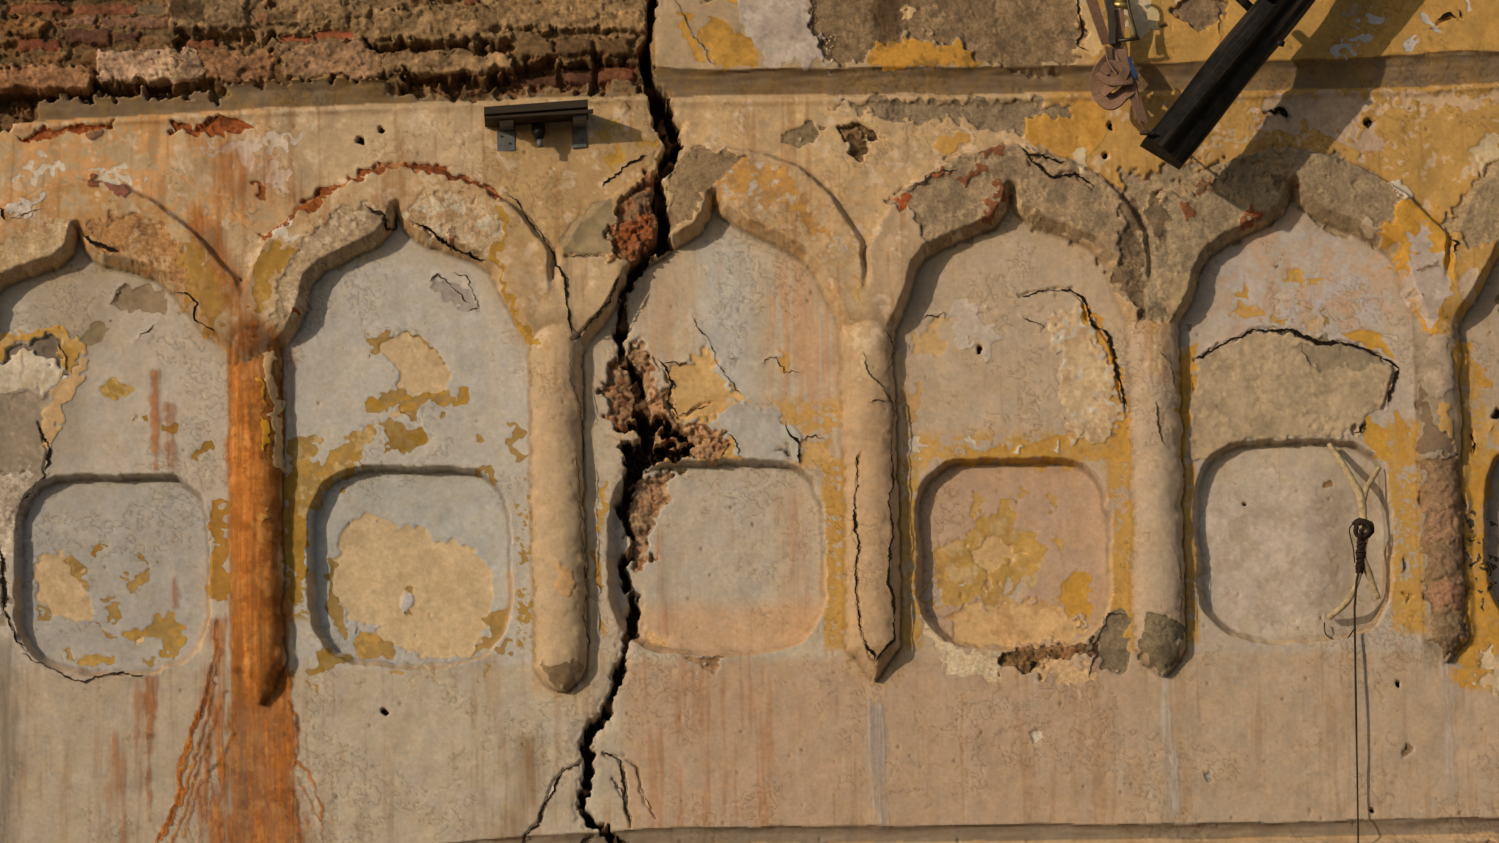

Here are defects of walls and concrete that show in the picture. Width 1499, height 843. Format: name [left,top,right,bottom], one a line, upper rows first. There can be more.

crack [0,550,143,683]
corrosion [144,677,154,799]
corrosion [150,371,169,469]
corrosion [155,321,323,843]
flaking render [0,0,659,626]
peeling [255,329,521,697]
crack [505,0,795,843]
peeling [559,145,848,280]
peeling [594,339,834,573]
crack [853,329,896,662]
flaking render [676,0,1499,696]
crack [1021,289,1399,442]